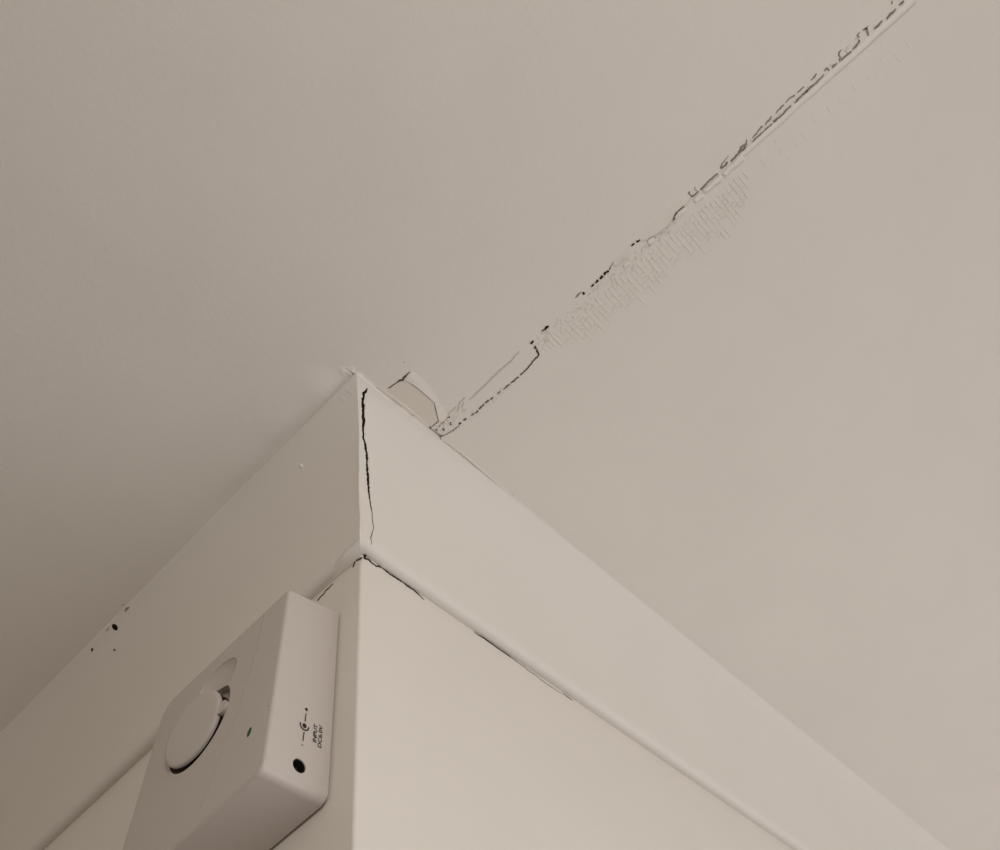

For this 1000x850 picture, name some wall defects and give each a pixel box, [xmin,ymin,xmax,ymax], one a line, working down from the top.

crack [353,0,917,600]
peeling [386,372,448,428]
crack [475,632,572,700]